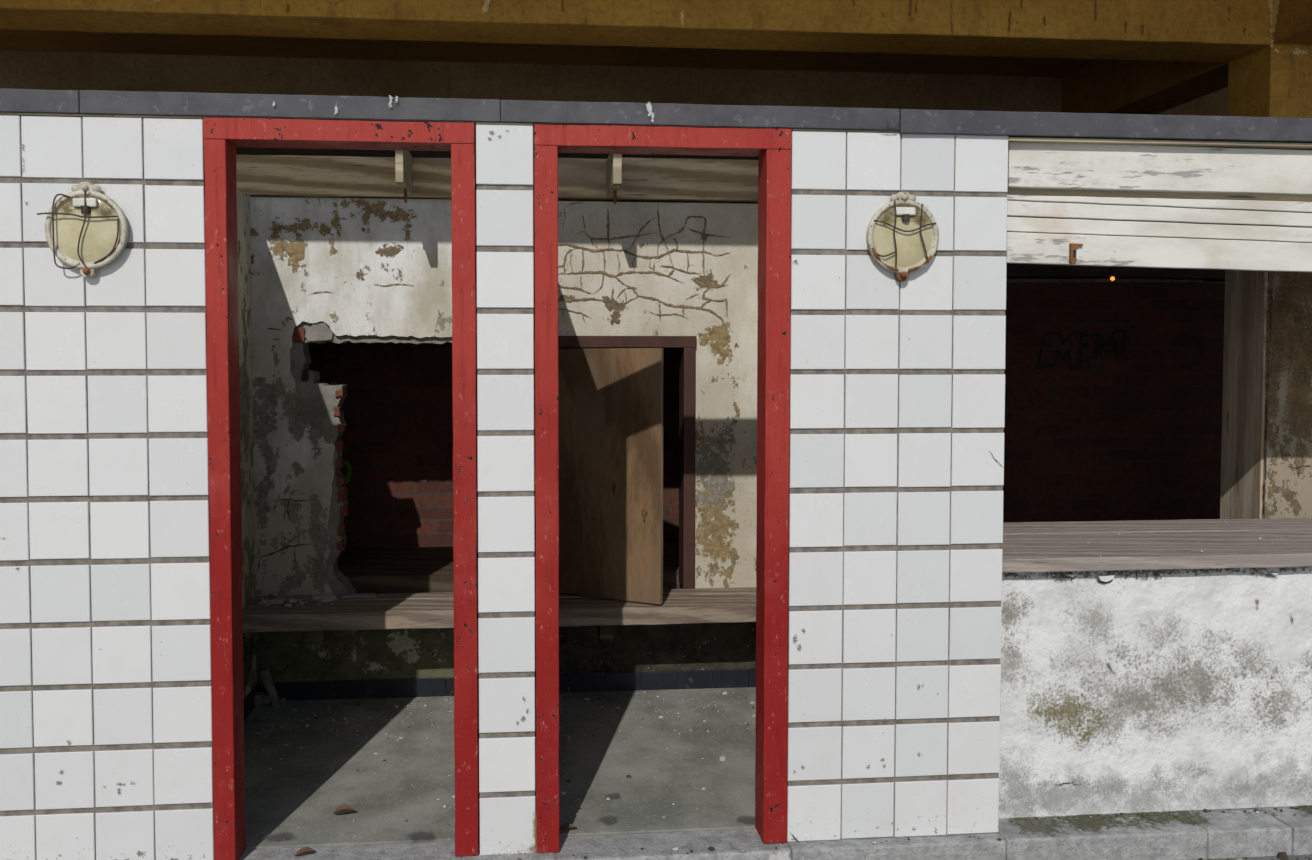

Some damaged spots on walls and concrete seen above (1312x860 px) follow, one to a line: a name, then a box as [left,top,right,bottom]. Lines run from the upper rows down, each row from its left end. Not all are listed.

peeling [250,198,417,275]
crack [558,202,730,338]
peeling [698,322,733,365]
peeling [1267,308,1312,506]
water stain [1027,689,1104,750]